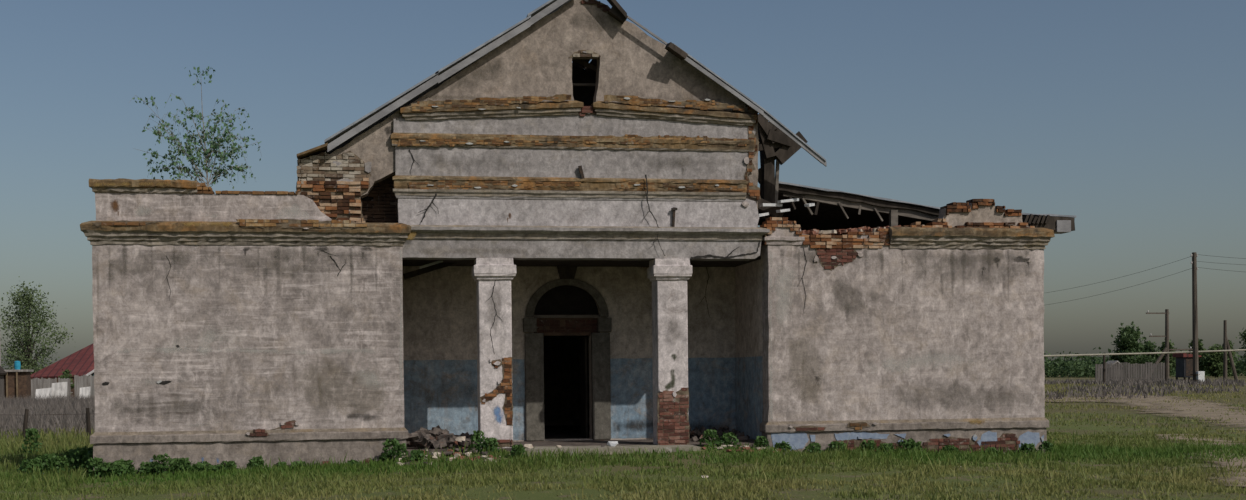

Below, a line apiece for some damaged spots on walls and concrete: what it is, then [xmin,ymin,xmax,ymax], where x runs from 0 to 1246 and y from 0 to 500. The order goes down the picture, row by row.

spalling [236,151,372,229]
crack [409,149,439,222]
crack [642,175,761,316]
spalling [814,248,863,271]
crack [488,280,502,350]
spalling [480,357,514,448]
spalling [657,387,689,445]